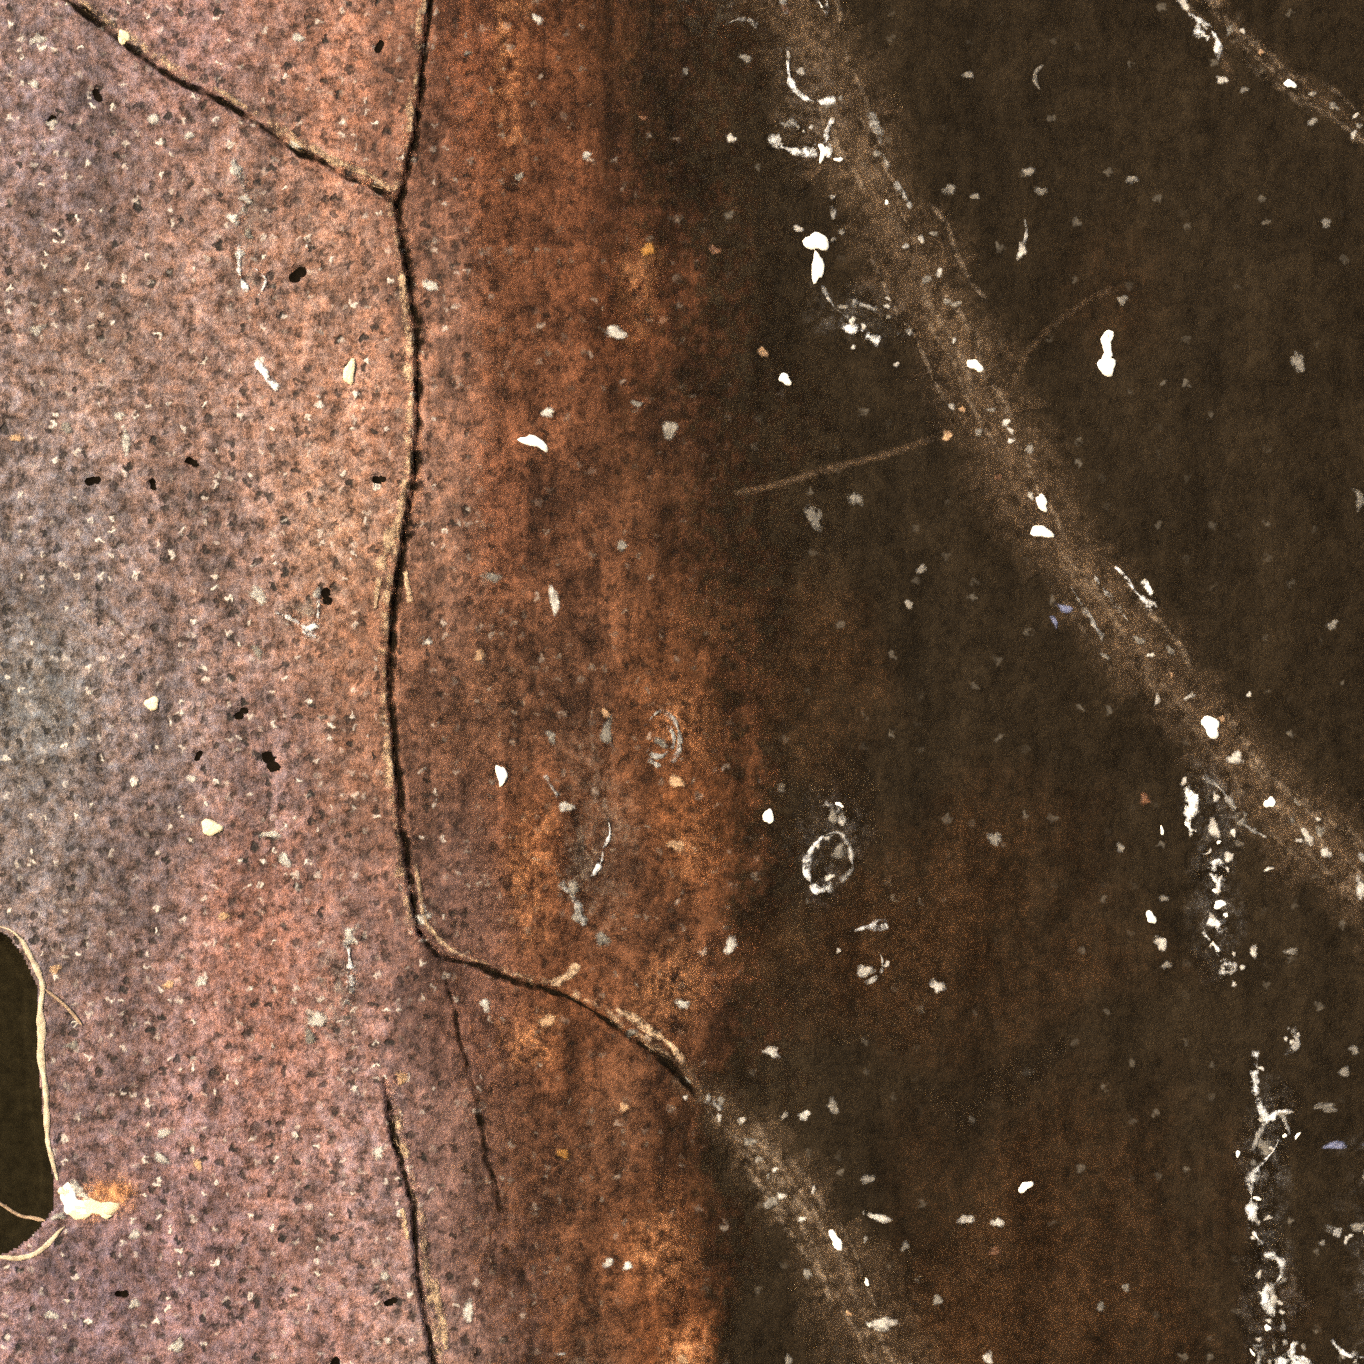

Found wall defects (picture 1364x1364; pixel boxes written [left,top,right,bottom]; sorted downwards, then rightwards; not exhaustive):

crack [64,0,695,1241]
damp [545,775,574,811]
damp [563,882,609,945]
corrosion [383,0,791,1364]
damp [600,709,611,742]
damp [615,0,1364,1364]
spalling [0,926,131,1261]
crack [387,1099,476,1364]